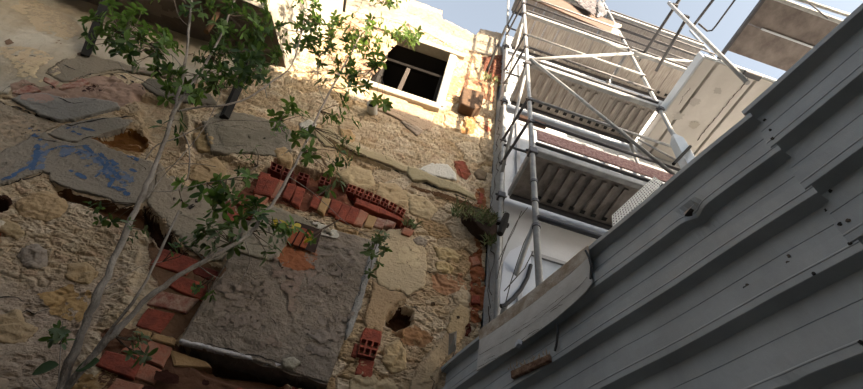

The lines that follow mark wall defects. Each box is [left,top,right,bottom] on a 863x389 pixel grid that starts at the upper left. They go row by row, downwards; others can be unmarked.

peeling [0,55,487,389]